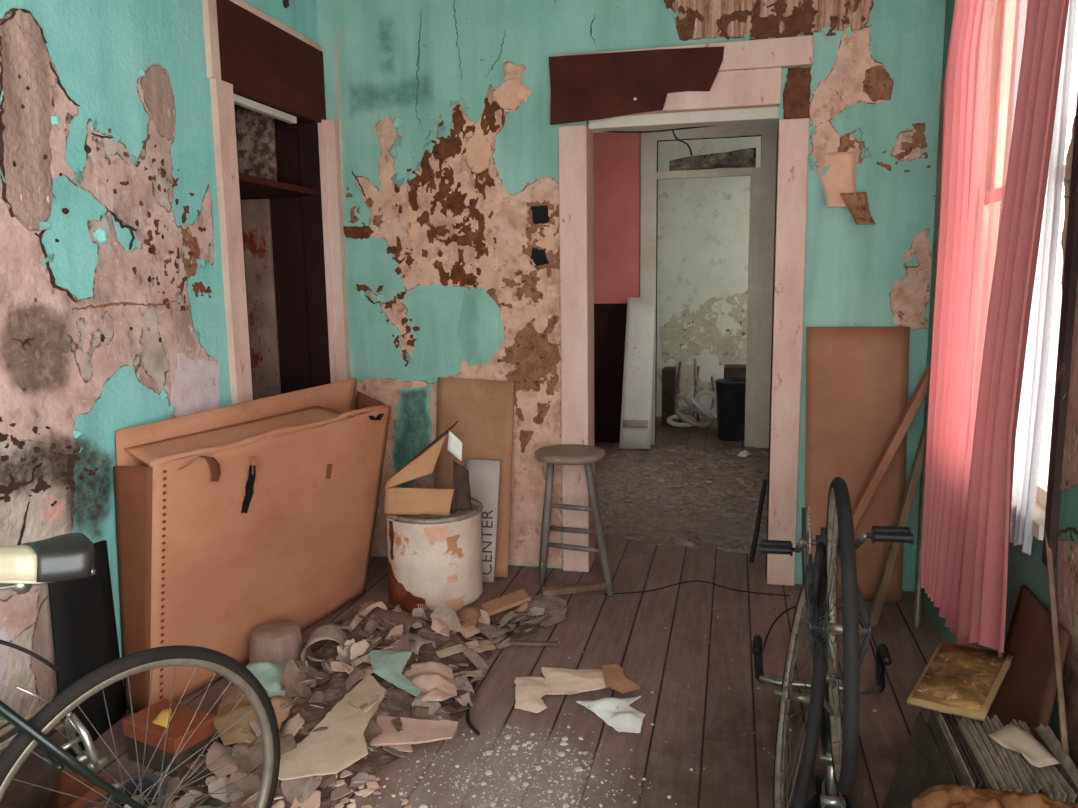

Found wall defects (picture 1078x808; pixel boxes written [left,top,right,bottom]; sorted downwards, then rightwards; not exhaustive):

crack [415,9,423,124]
crack [453,0,505,79]
peeling [664,0,945,331]
flaking render [1061,115,1076,288]
leakage [3,307,69,391]
peeling [0,45,221,546]
peeling [343,61,563,567]
peeling [658,289,748,397]
peeling [1061,277,1078,490]
leakage [0,439,111,535]
peeling [0,583,58,721]
peeling [1056,539,1078,769]